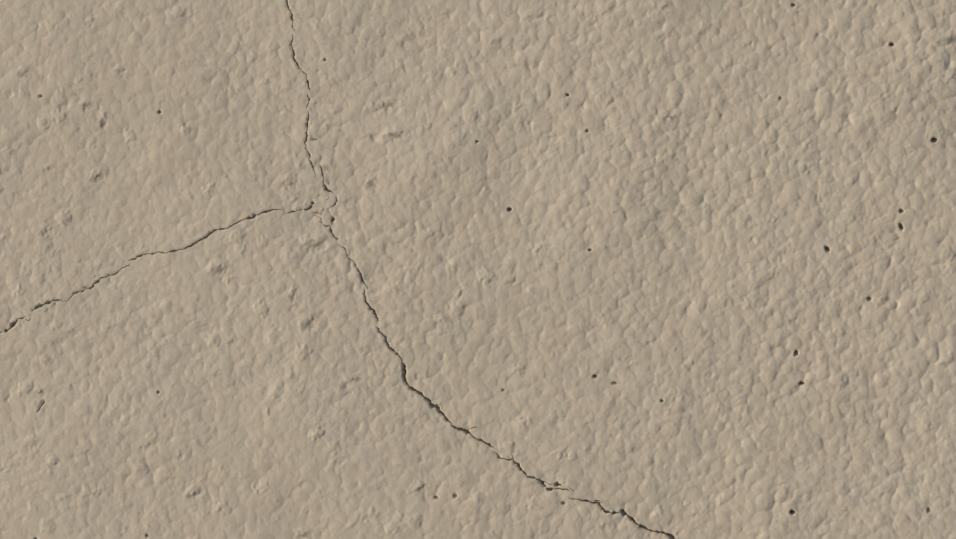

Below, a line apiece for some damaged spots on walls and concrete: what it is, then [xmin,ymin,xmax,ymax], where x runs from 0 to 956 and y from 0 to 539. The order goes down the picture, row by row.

crack [0,0,677,539]